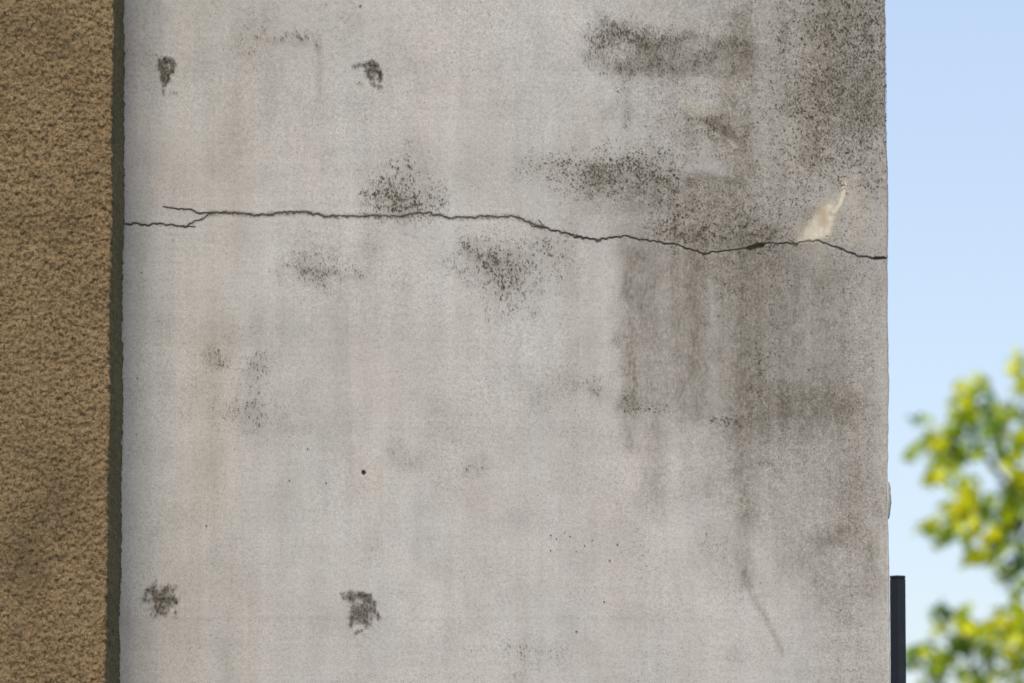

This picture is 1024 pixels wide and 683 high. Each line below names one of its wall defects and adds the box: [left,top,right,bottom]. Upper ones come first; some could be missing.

mould [585,11,742,81]
mould [775,0,887,166]
mould [360,165,450,221]
mould [551,148,678,204]
crack [125,206,886,259]
mould [462,242,529,312]